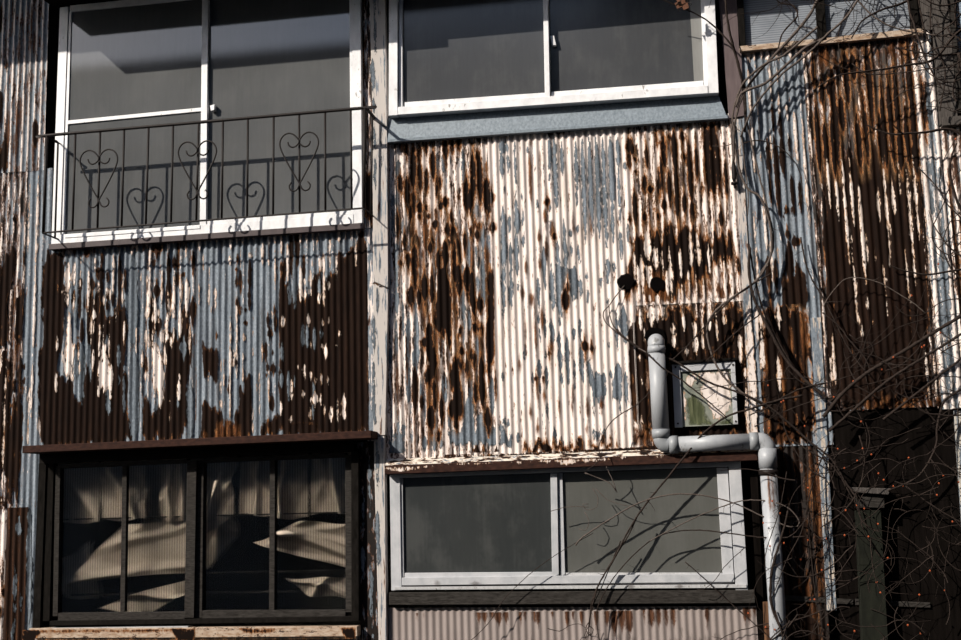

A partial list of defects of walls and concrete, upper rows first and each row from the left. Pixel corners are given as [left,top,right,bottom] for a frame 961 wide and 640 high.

peeling [27,176,40,347]
peeling [55,231,358,441]
peeling [361,160,433,640]
peeling [461,140,529,364]
corrosion [394,119,748,458]
peeling [531,135,735,445]
corrosion [758,104,824,640]
corrosion [810,37,940,410]
corrosion [944,132,961,324]
peeling [10,509,32,640]
corrosion [475,612,553,625]
corrosion [565,608,675,634]